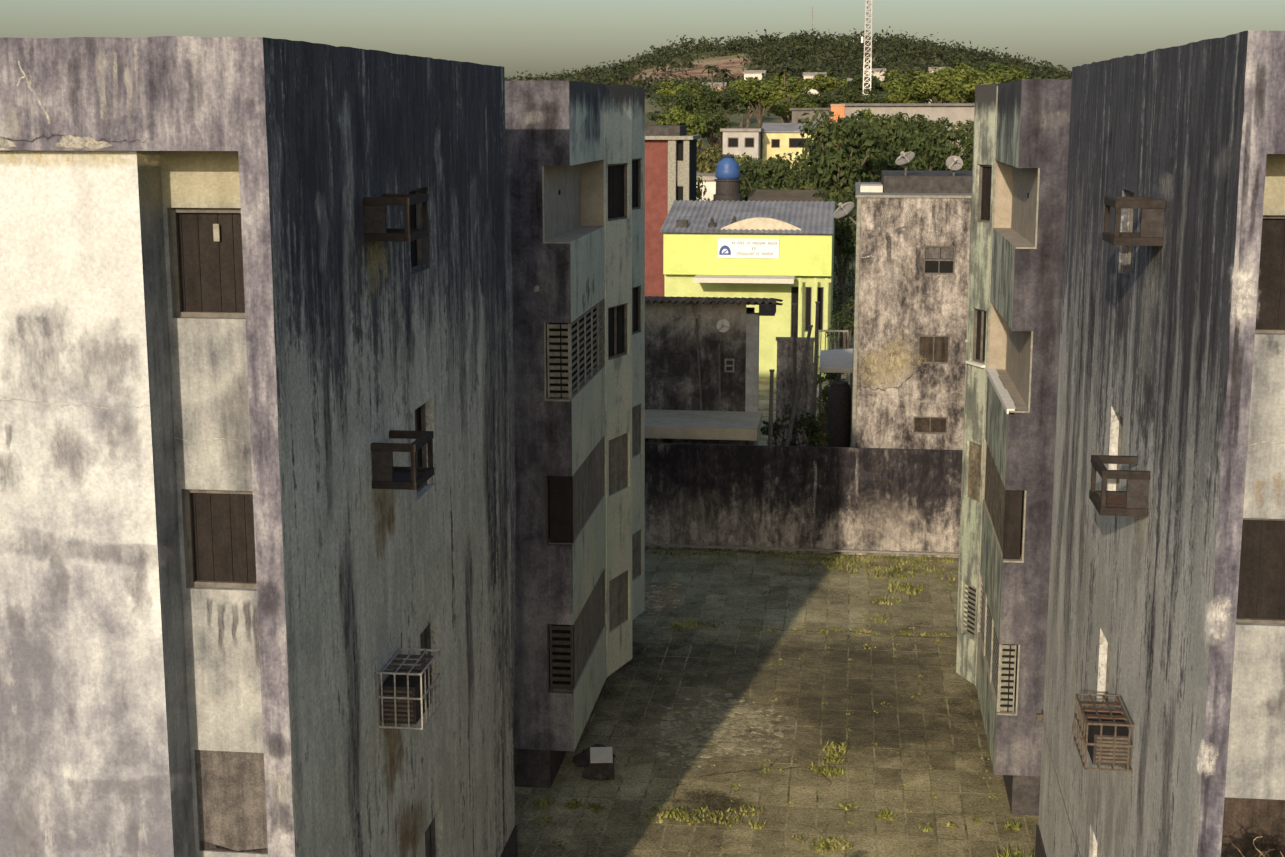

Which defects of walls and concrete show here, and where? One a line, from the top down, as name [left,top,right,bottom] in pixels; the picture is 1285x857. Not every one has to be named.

spalling [0,138,17,148]
spalling [56,135,113,149]
water stain [1227,145,1258,223]
water stain [87,344,133,388]
water stain [303,99,515,598]
water stain [1230,317,1243,433]
water stain [55,434,83,466]
water stain [1057,283,1094,626]
water stain [207,578,303,852]
water stain [340,565,360,829]